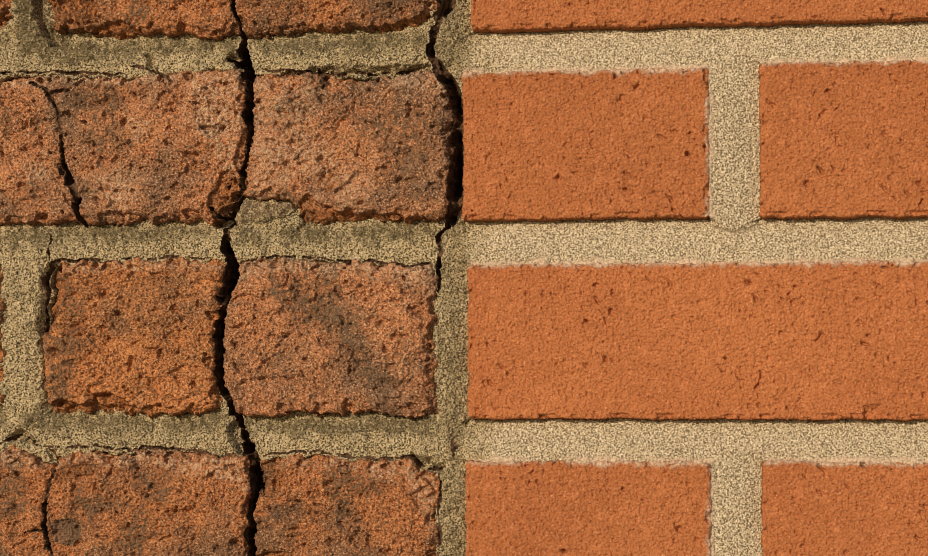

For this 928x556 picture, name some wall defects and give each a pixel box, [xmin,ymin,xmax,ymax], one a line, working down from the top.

crack [0,0,464,556]